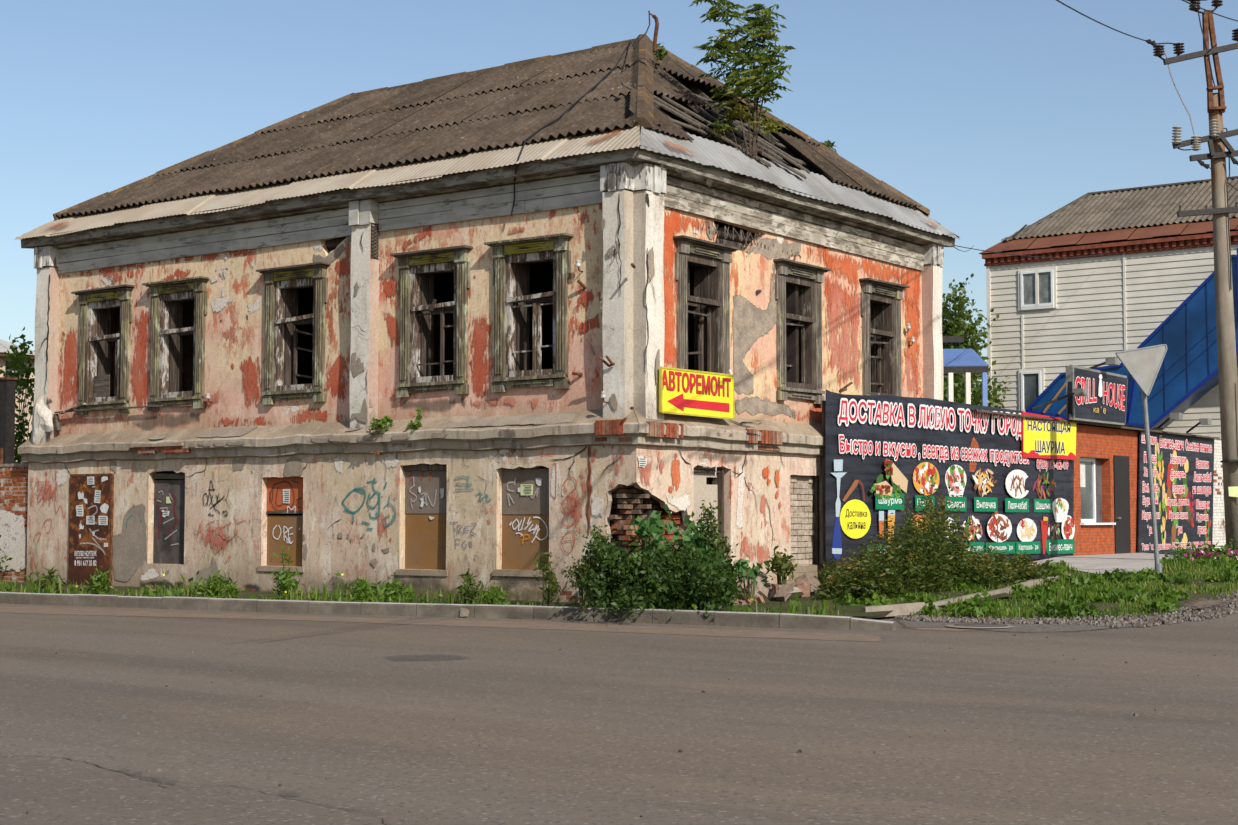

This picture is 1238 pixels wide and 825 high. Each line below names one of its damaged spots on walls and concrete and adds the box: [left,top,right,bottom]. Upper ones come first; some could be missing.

peeling [404,226,431,251]
peeling [46,291,151,441]
peeling [62,250,249,343]
spalling [130,435,191,454]
peeling [214,236,382,455]
peeling [383,274,399,348]
peeling [467,318,538,409]
peeling [568,284,602,339]
spalling [563,393,689,560]
peeling [731,233,922,570]
flaking render [0,470,58,579]
peeling [337,512,392,568]